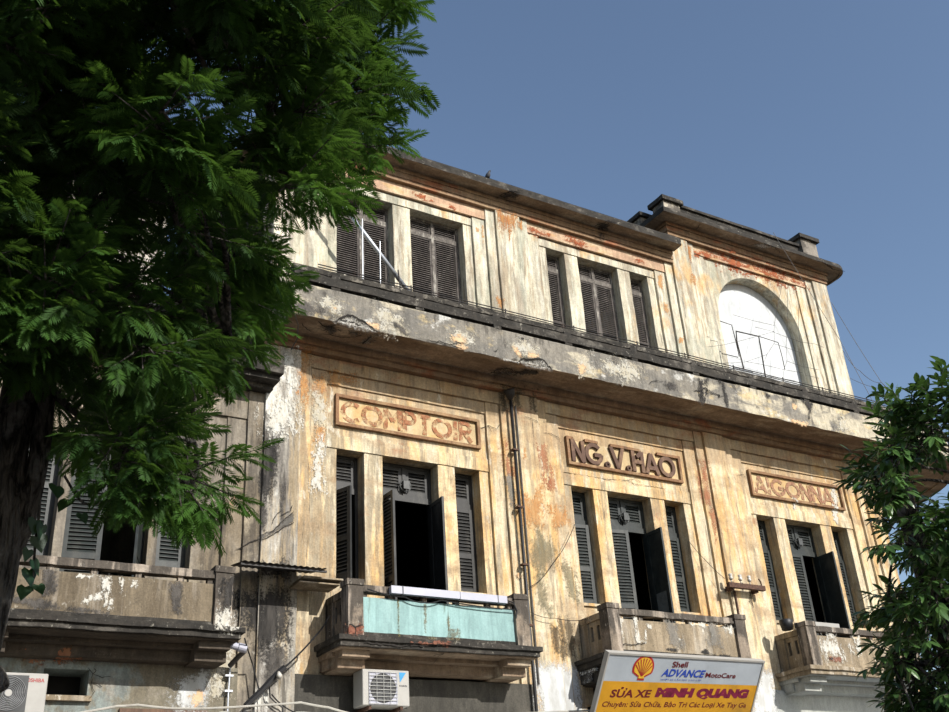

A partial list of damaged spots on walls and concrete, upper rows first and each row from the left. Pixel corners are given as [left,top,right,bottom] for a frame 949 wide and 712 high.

corrosion [497,209,551,241]
corrosion [684,242,808,292]
peeling [446,329,476,349]
peeling [488,335,552,383]
peeling [254,346,359,499]
peeling [76,573,138,610]
peeling [214,605,239,635]
water stain [218,557,297,684]